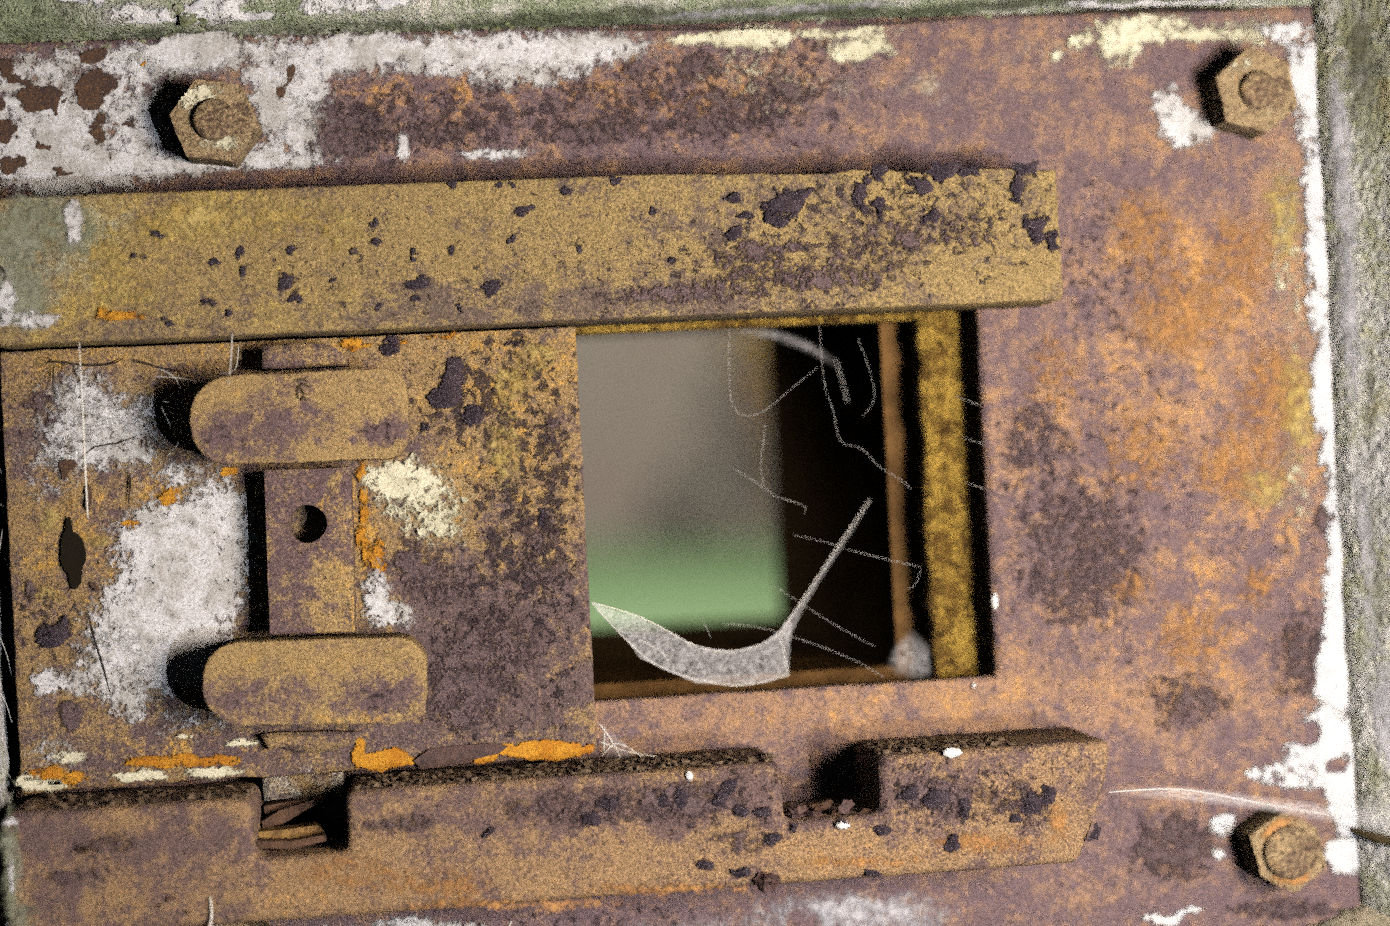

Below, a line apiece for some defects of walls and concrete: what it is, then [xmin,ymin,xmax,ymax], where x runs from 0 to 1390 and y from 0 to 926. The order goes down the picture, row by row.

damp [673,2,895,19]
damp [1043,0,1228,10]
corrosion [0,48,135,175]
peeling [0,0,908,329]
damp [1224,14,1368,877]
peeling [15,365,268,794]
corrosion [999,335,1327,732]
corrosion [351,738,416,773]
corrosion [471,739,595,765]
peeling [0,806,36,926]
corrosion [257,794,328,849]
damp [1208,812,1236,861]